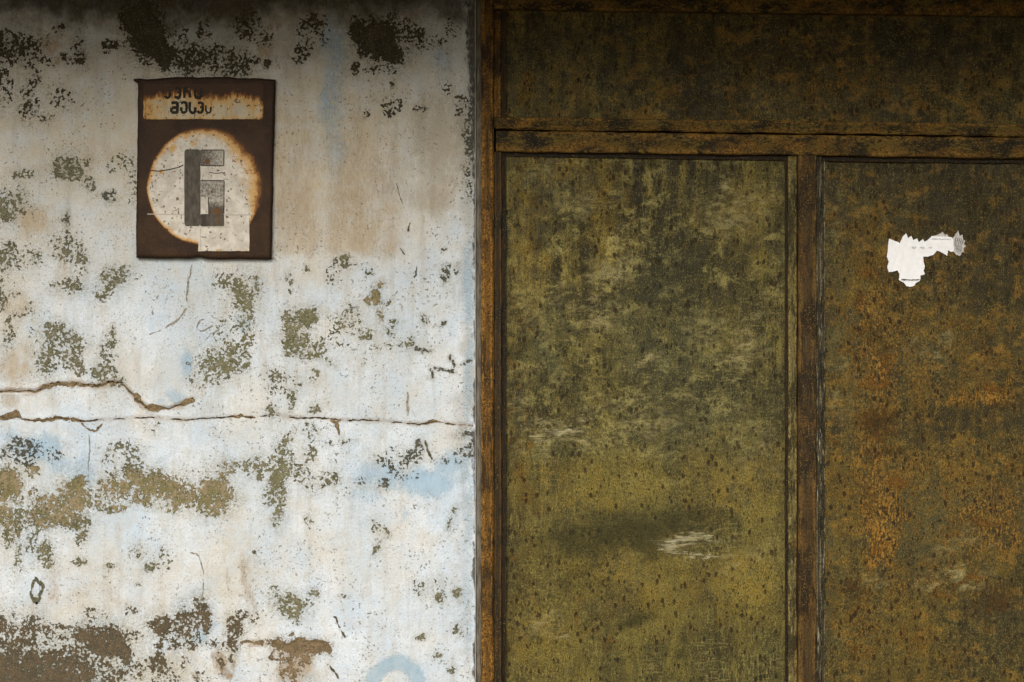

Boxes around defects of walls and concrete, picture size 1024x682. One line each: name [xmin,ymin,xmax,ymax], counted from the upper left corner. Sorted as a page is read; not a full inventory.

flaking render [101,0,178,72]
flaking render [347,12,463,75]
flaking render [363,281,392,321]
crack [0,381,473,478]
flaking render [0,461,238,543]
flaking render [0,576,144,682]
spalling [240,633,332,682]